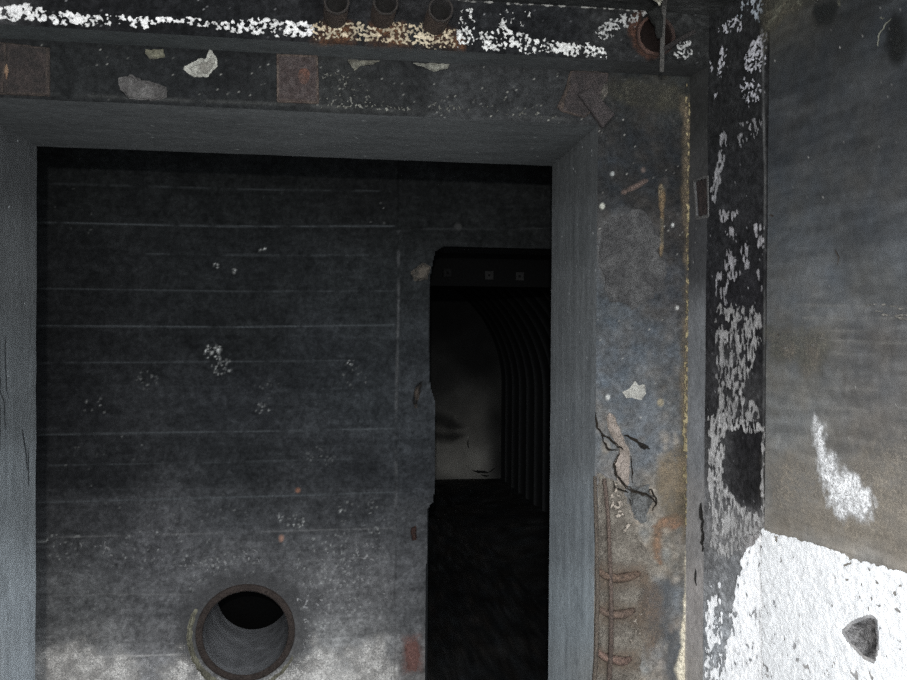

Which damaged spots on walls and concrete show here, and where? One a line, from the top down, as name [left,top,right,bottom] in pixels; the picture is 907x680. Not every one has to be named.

spalling [597,413,654,680]
crack [595,412,658,511]
peeling [704,118,907,680]
water stain [771,417,907,552]